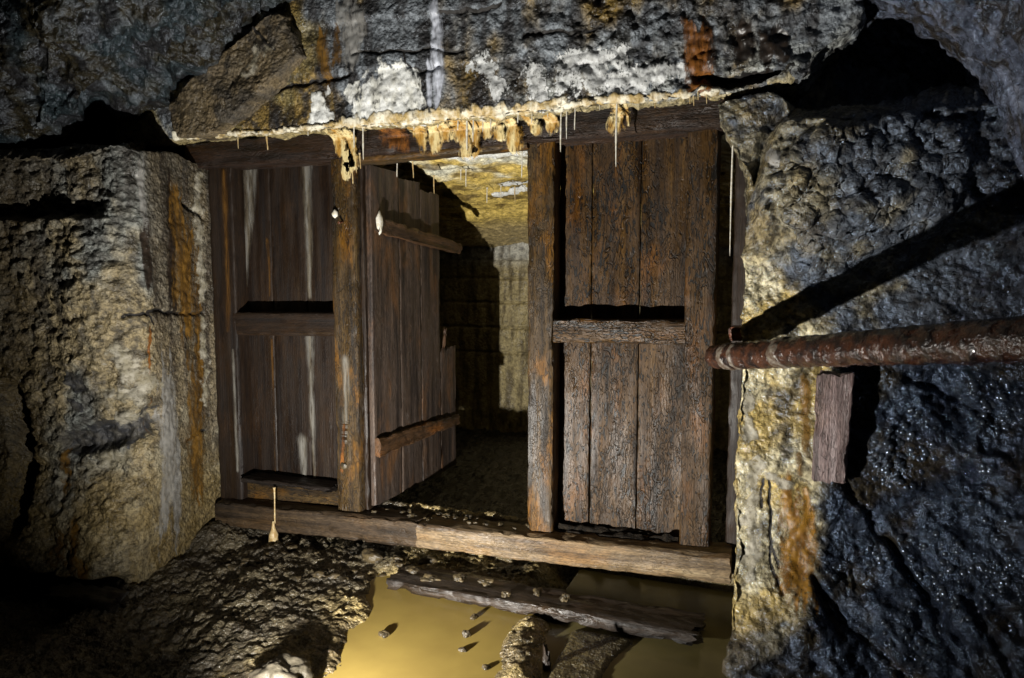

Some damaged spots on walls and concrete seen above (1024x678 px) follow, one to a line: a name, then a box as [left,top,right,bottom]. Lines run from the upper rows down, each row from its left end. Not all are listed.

water stain [308,85,335,125]
water stain [336,0,444,127]
water stain [465,46,509,102]
water stain [518,41,693,114]
rust [683,19,713,97]
crack [121,308,202,325]
rust [169,185,205,506]
water stain [155,353,182,550]
crack [759,478,784,596]
rust [780,376,819,614]